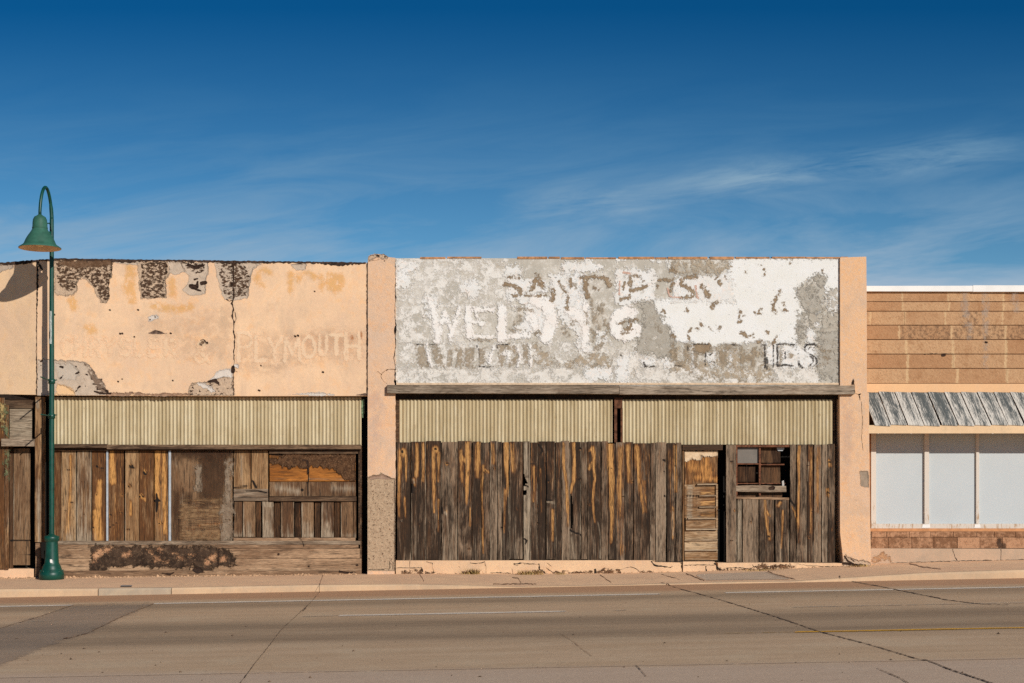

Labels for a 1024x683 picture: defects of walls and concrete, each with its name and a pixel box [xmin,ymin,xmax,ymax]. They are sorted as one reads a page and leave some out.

peeling [37,359,239,397]
flaking render [54,259,261,334]
crack [227,261,236,395]
peeling [368,253,854,385]
flaking render [368,473,434,574]